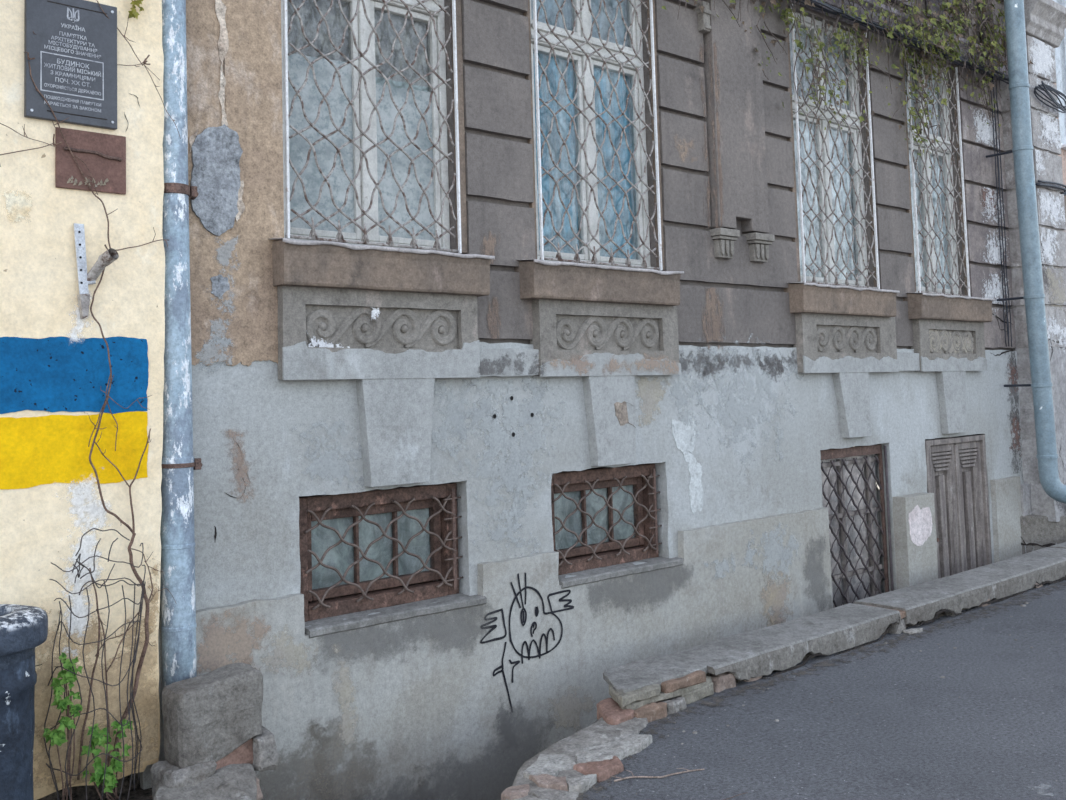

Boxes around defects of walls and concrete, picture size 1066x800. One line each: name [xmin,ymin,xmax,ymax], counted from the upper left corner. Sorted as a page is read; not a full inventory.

peeling [973,110,999,148]
peeling [978,186,1009,317]
peeling [1028,37,1066,352]
peeling [449,354,593,554]
peeling [606,338,803,514]
water stain [257,607,484,800]
water stain [385,707,542,800]